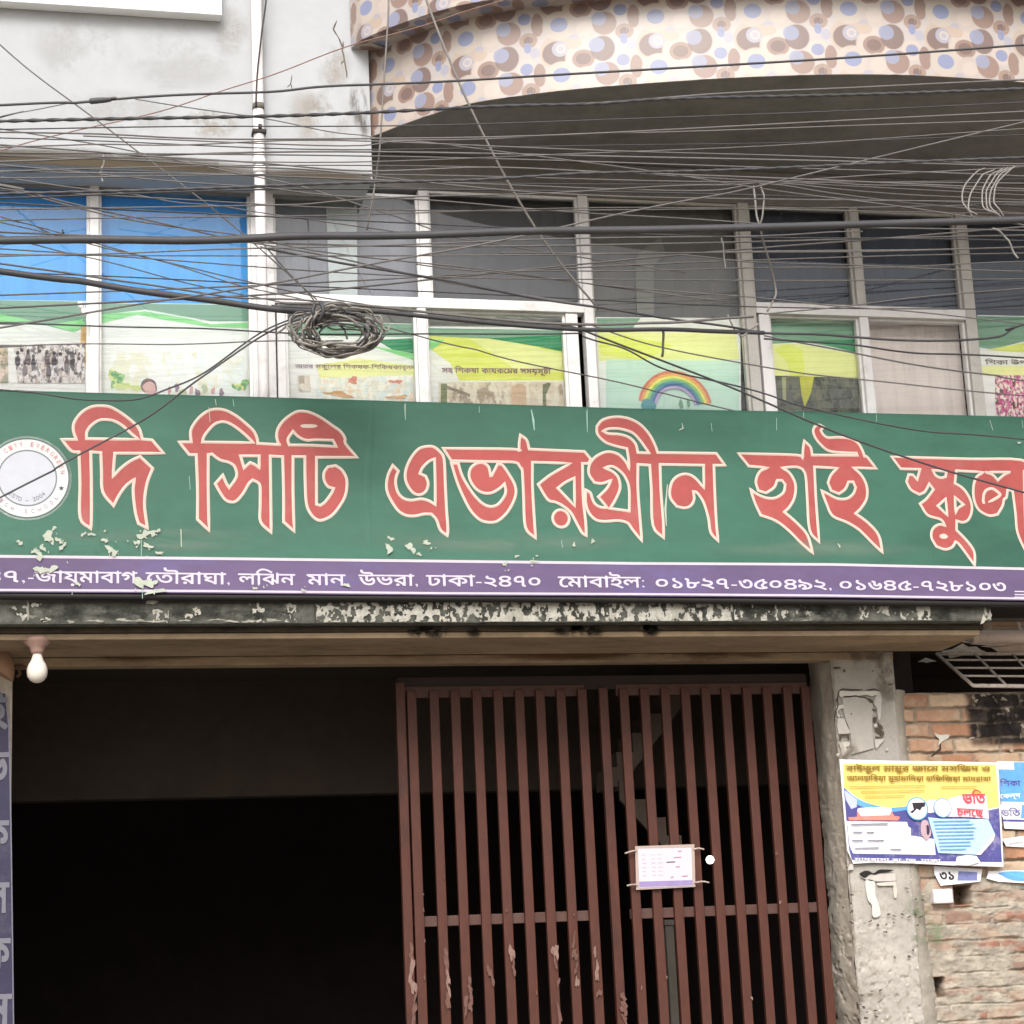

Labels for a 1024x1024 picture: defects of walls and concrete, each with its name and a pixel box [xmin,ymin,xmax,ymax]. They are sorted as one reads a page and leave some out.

peeling [16,526,81,594]
peeling [81,528,163,557]
peeling [385,536,436,556]
peeling [9,603,51,623]
peeling [116,577,296,623]
peeling [316,602,811,622]
peeling [859,606,931,620]
peeling [835,684,893,756]